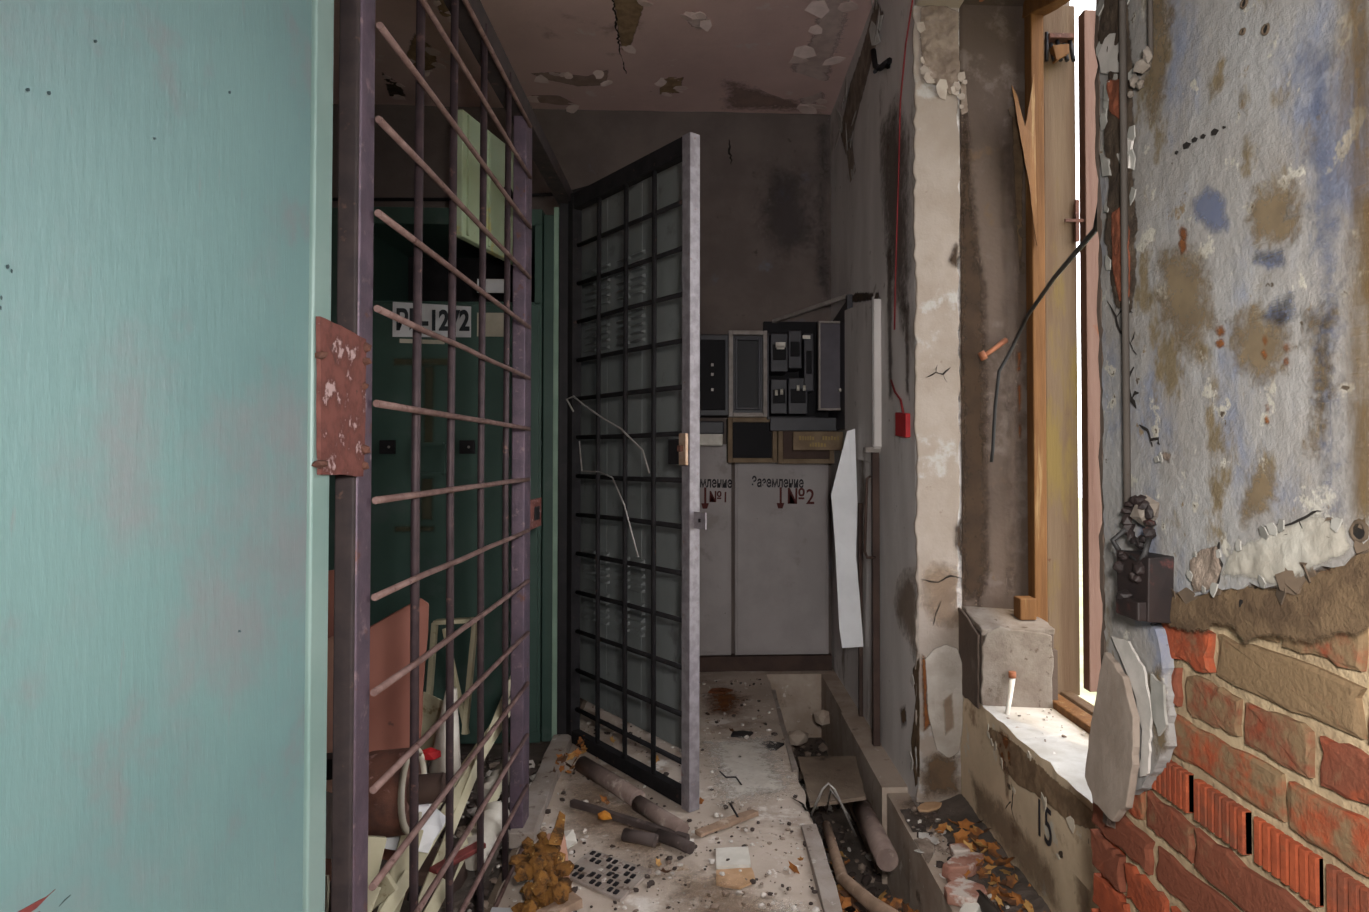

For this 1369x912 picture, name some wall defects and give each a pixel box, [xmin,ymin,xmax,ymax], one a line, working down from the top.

peeling [527,70,613,113]
crack [612,0,627,73]
spalling [614,0,653,54]
peeling [789,0,883,182]
spalling [916,5,968,115]
damp [1157,250,1215,360]
damp [1230,305,1287,379]
damp [1247,182,1300,243]
damp [1346,0,1369,512]
damp [1242,465,1273,519]
spalling [1167,516,1369,644]
flaking render [987,636,1168,833]